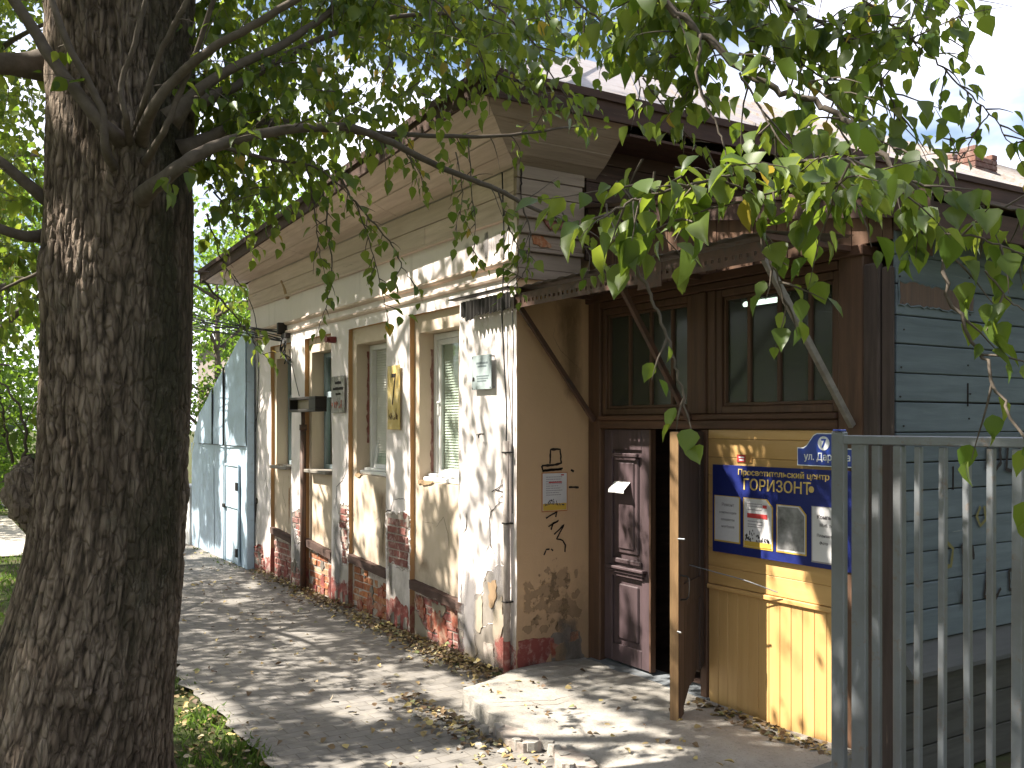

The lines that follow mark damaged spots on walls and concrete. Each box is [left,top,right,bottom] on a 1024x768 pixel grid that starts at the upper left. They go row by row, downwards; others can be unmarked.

spalling [254,502,584,673]